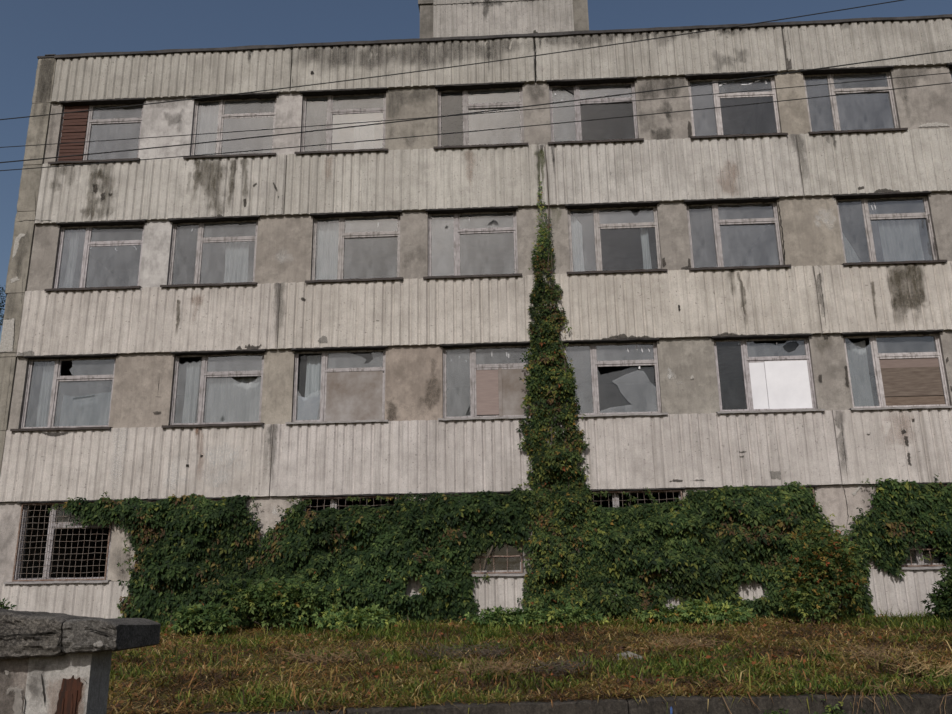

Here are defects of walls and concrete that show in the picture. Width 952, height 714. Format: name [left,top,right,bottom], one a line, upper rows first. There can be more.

leakage [194,160,246,214]
leakage [890,266,925,308]